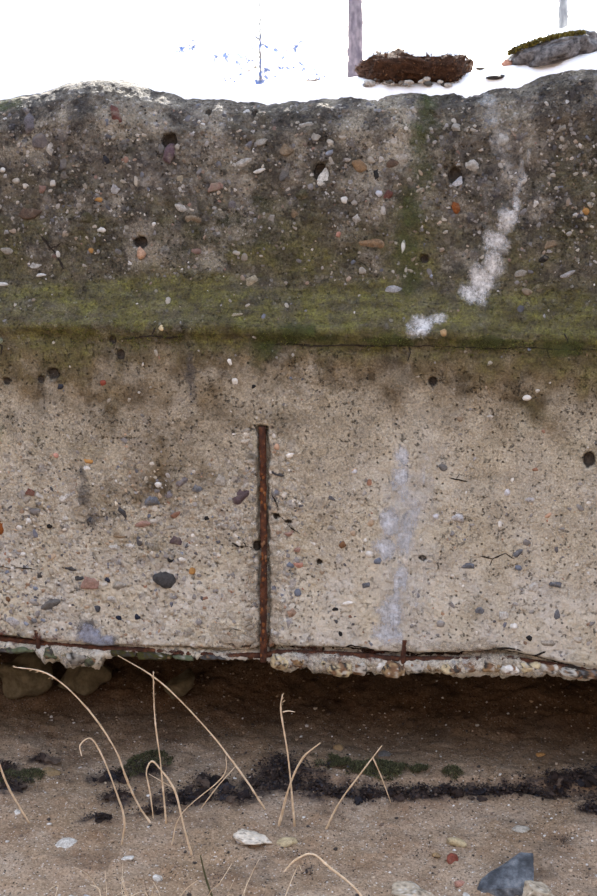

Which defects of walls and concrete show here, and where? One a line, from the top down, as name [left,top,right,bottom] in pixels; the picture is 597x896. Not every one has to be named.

water stain [463,202,518,302]
water stain [415,315,443,334]
spalling [110,428,597,681]
spalling [0,645,96,669]